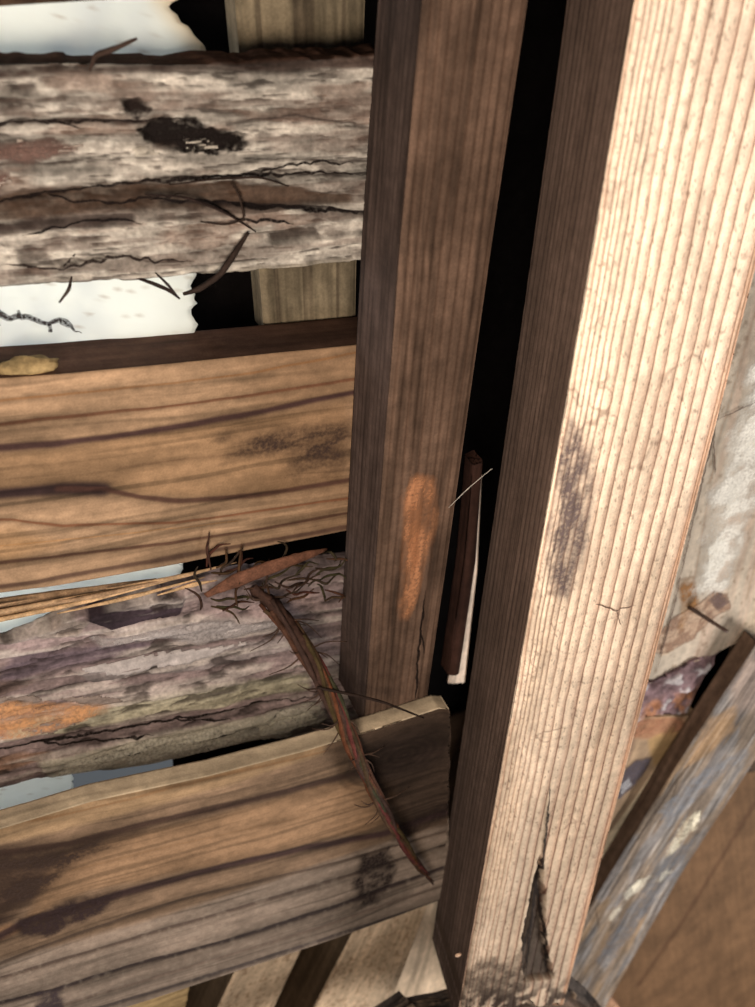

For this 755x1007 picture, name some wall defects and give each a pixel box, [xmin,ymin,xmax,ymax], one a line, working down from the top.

crack [0,160,366,235]
crack [5,253,194,271]
crack [0,310,82,334]
damp [553,425,591,595]
crack [521,788,551,984]